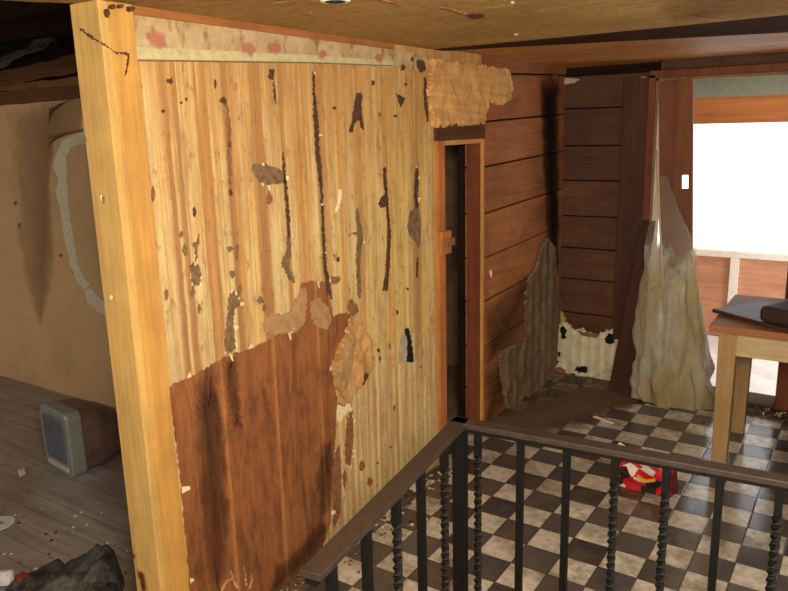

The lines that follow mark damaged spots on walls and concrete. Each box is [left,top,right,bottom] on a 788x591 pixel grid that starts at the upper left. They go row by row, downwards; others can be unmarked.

crack [439,6,484,19]
crack [80,28,130,76]
peeling [426,58,514,128]
peeling [345,301,359,333]
peeling [498,238,618,409]